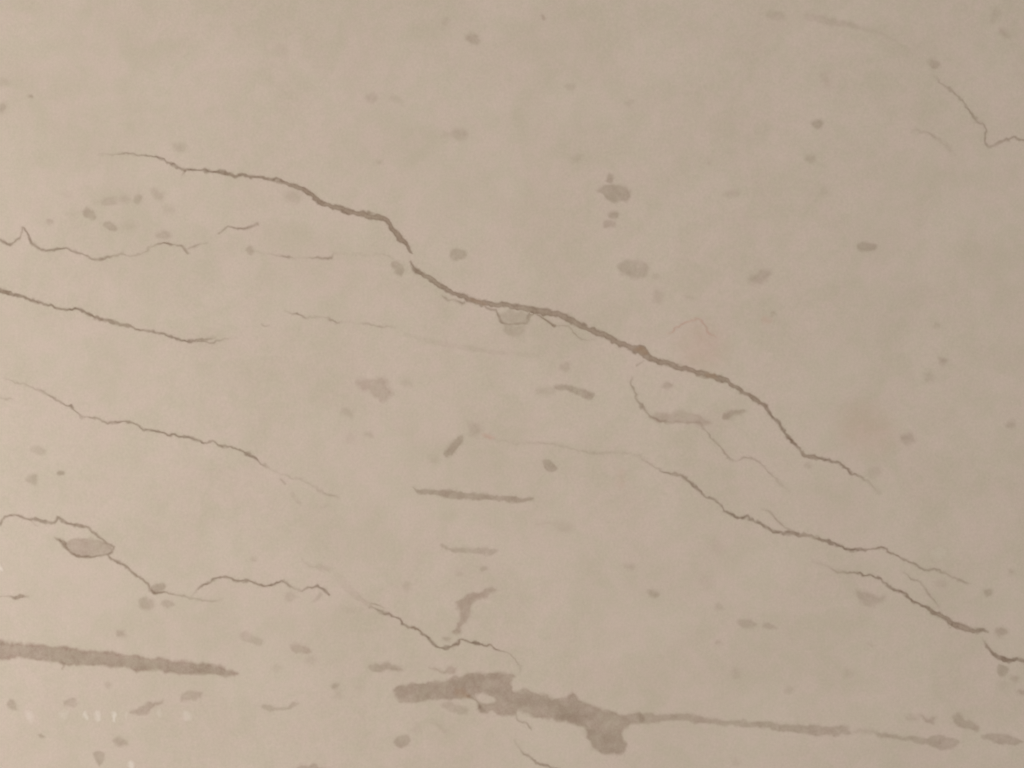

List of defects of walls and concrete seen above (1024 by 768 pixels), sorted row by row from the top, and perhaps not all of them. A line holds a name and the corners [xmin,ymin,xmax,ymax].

crack [932,73,1024,149]
crack [0,151,1024,677]
damp [411,486,535,505]
damp [451,585,499,637]
damp [0,628,241,703]
damp [366,659,1024,757]